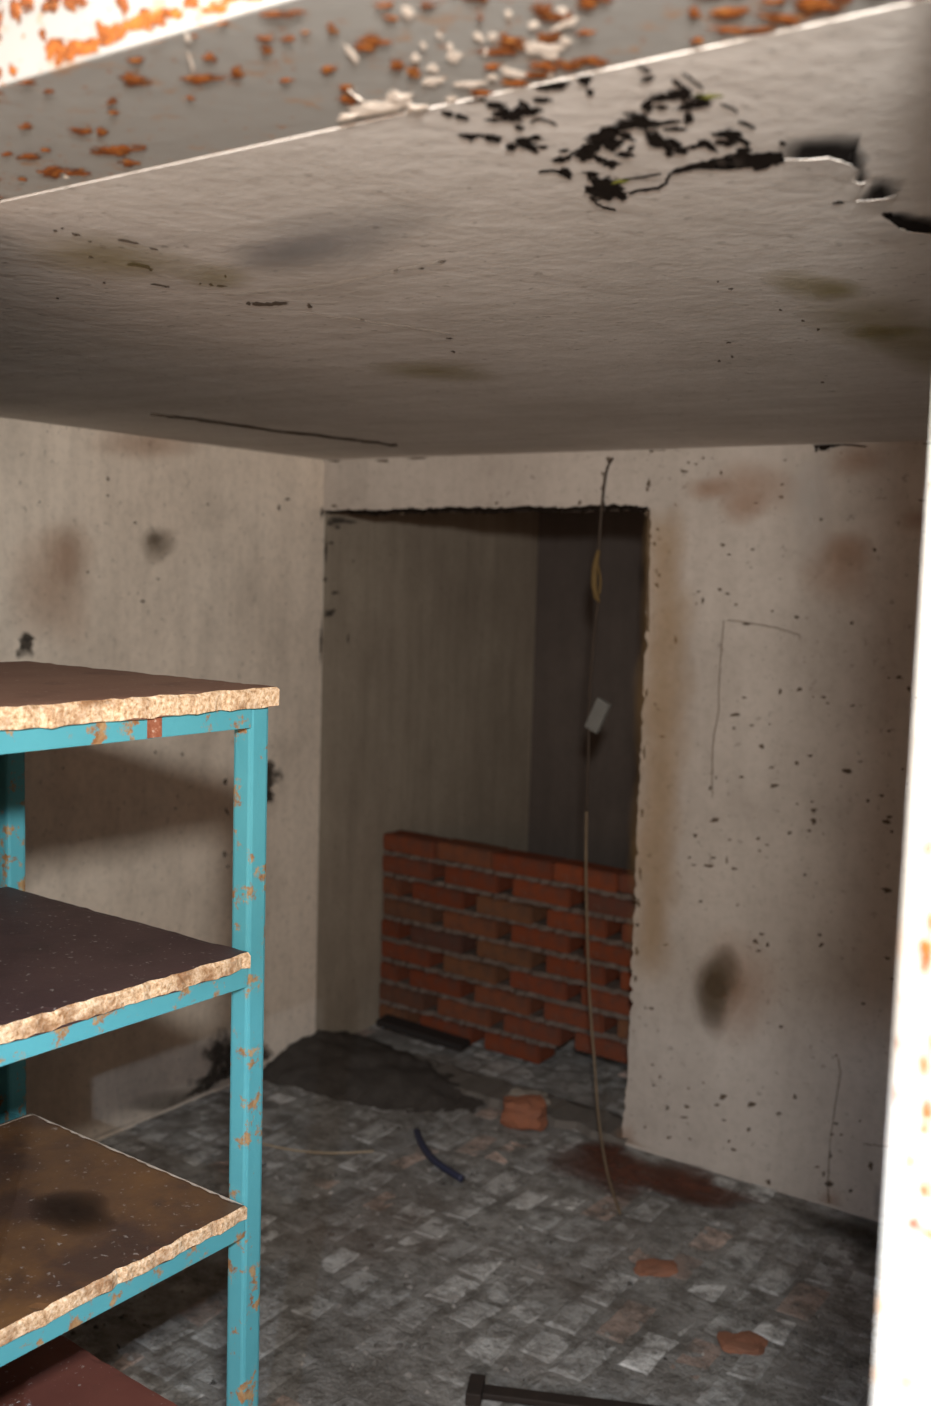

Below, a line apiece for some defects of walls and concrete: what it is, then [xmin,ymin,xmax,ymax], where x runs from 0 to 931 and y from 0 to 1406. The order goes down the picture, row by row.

peeling [402,5,415,19]
peeling [344,46,359,64]
spalling [410,7,755,211]
crack [620,140,931,261]
water stain [167,1034,231,1109]